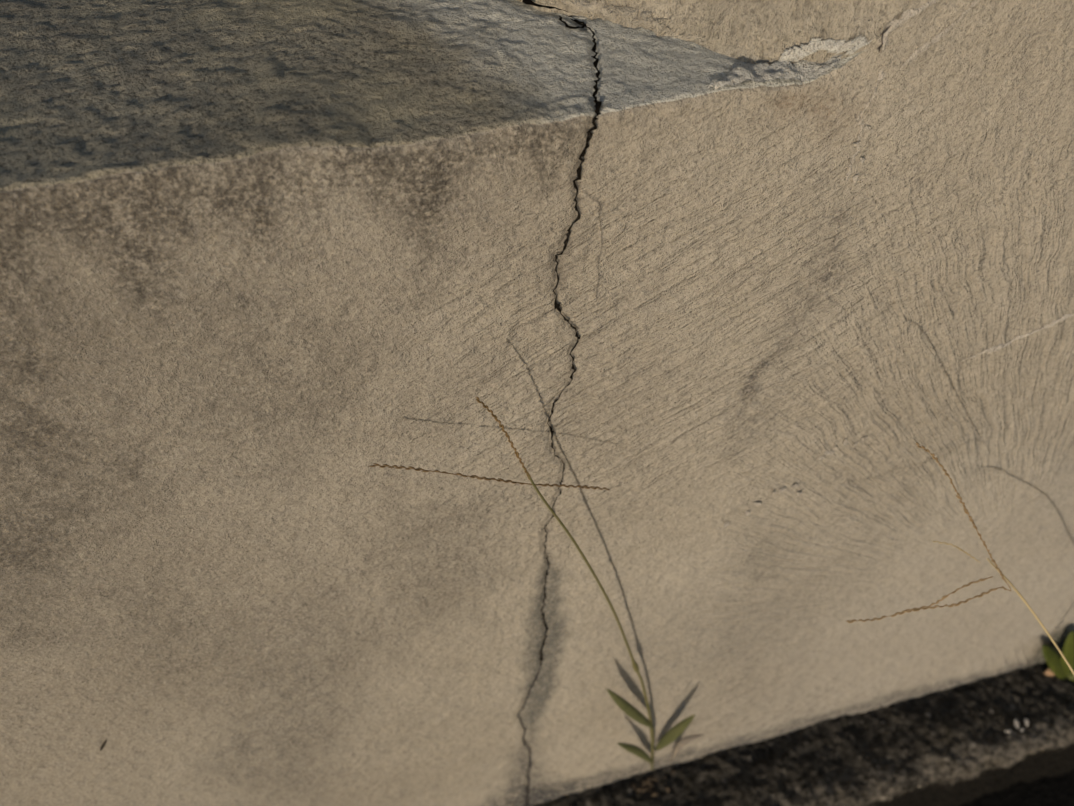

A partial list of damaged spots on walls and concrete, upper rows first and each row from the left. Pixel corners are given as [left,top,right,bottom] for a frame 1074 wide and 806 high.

crack [517,0,602,806]
crack [878,0,941,53]